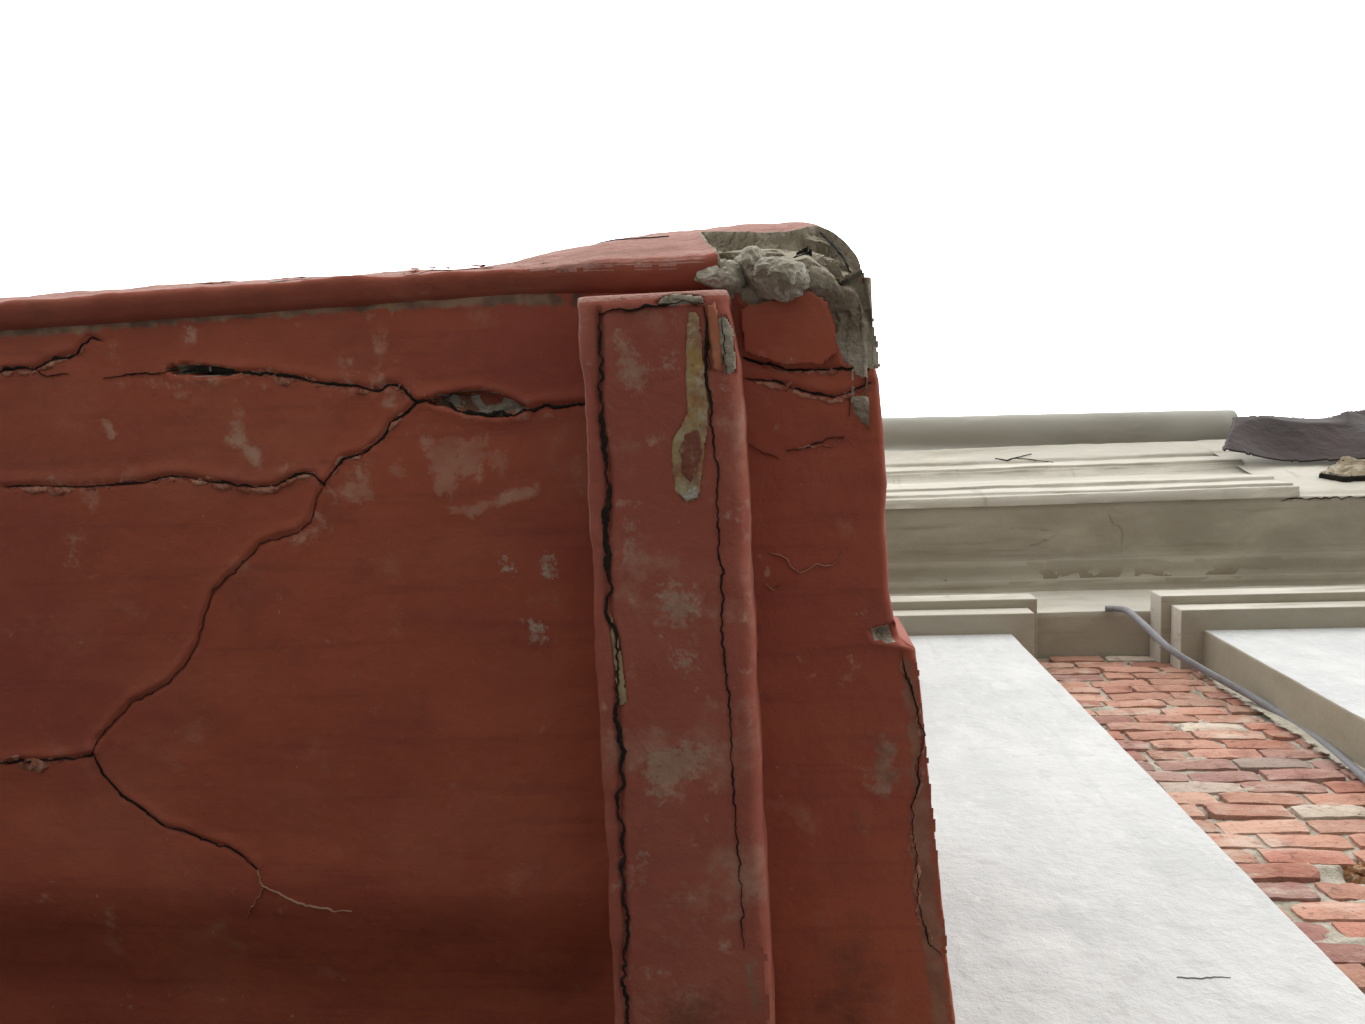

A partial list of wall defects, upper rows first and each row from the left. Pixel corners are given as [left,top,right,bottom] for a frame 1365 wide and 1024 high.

crack [0,336,102,377]
crack [596,236,669,244]
spalling [598,231,881,502]
crack [743,357,872,458]
crack [0,366,429,917]
crack [523,311,630,1024]
crack [704,307,745,940]
crack [899,654,942,957]
spalling [1342,862,1365,884]